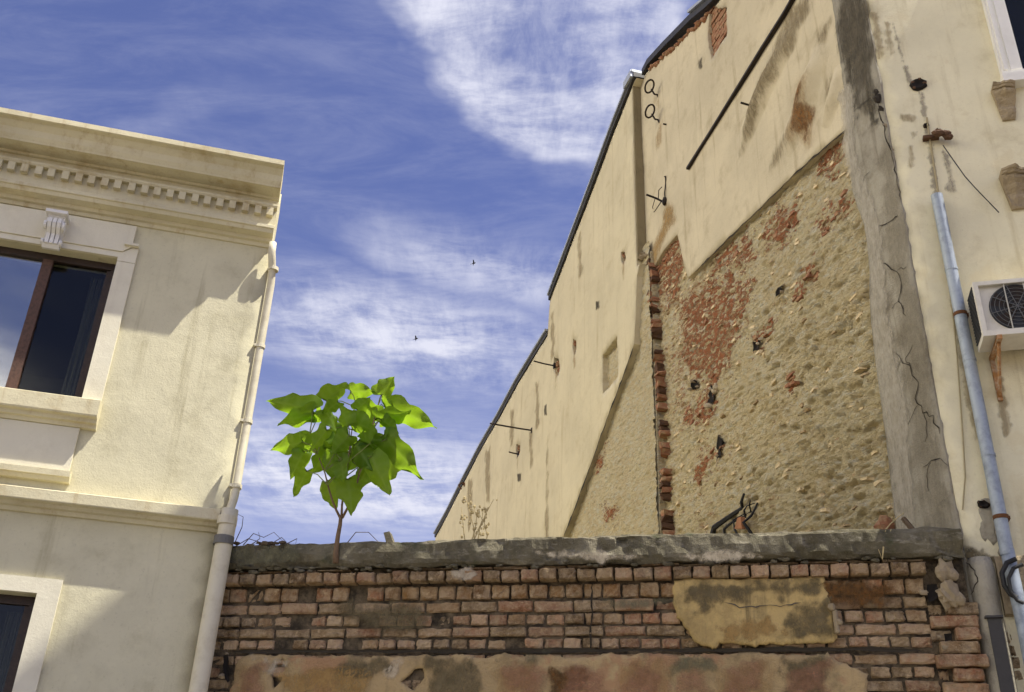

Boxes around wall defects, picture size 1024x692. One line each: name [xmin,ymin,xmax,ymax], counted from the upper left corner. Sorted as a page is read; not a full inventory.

spalling [648,6,727,71]
damp [743,0,808,138]
damp [822,0,900,124]
corrosion [791,85,814,140]
damp [929,151,954,193]
spalling [569,137,896,538]
flaking render [218,652,868,692]